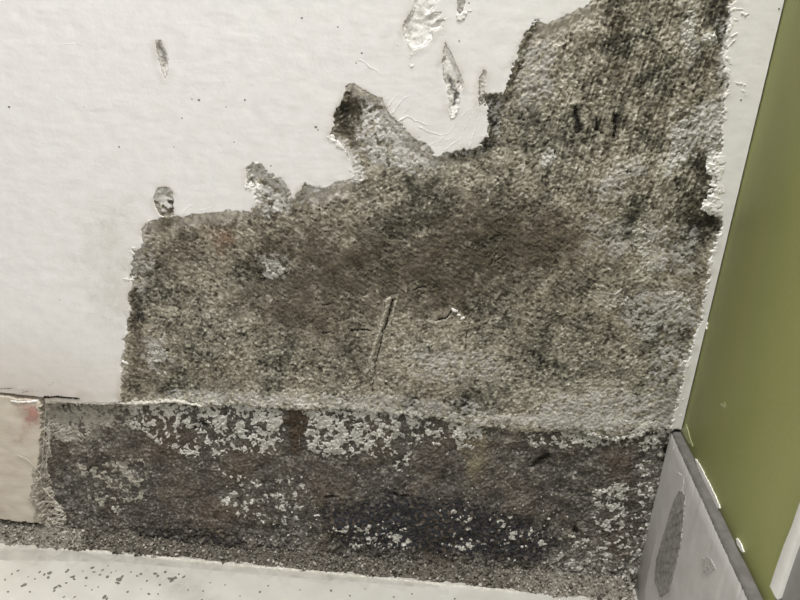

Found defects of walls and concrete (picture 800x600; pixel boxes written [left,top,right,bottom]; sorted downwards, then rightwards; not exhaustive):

leakage [251,211,561,329]
peeling [120,0,744,438]
crack [322,297,397,395]
leakage [284,409,308,455]
spalling [44,398,678,588]
leakage [323,492,558,564]